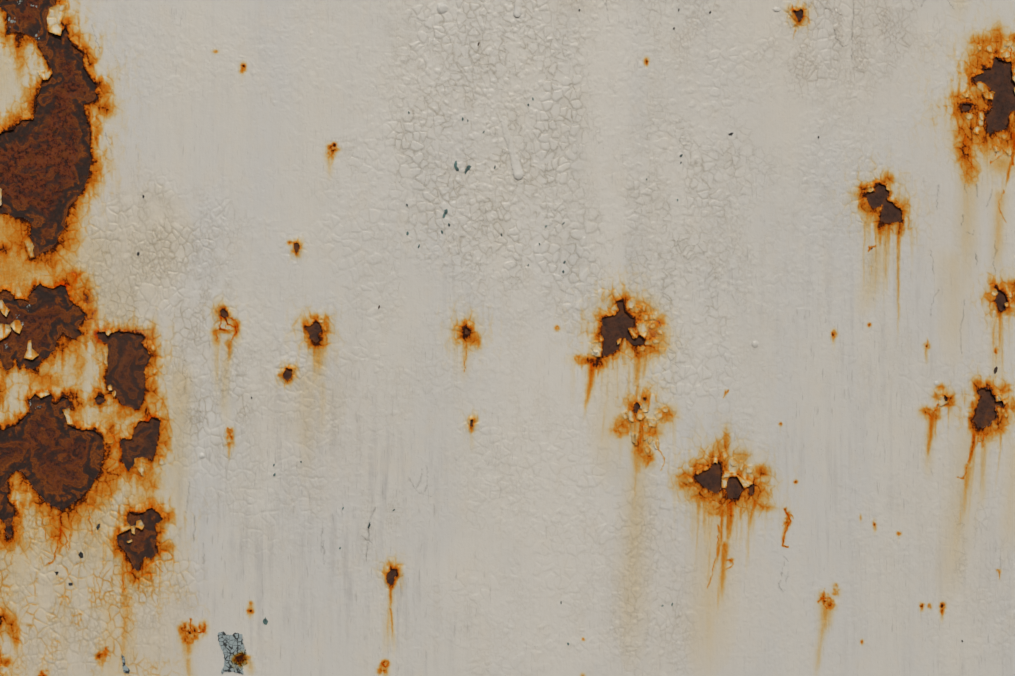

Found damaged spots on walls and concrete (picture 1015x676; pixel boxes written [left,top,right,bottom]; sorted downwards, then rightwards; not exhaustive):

corrosion [0,0,109,268]
corrosion [953,35,1015,174]
corrosion [859,178,904,234]
corrosion [303,317,326,348]
corrosion [585,297,663,384]
corrosion [990,282,1015,314]
corrosion [0,275,166,548]
corrosion [969,382,1014,455]
corrosion [683,445,766,519]
corrosion [114,505,170,582]
corrosion [386,566,399,588]
peeling [218,632,255,674]